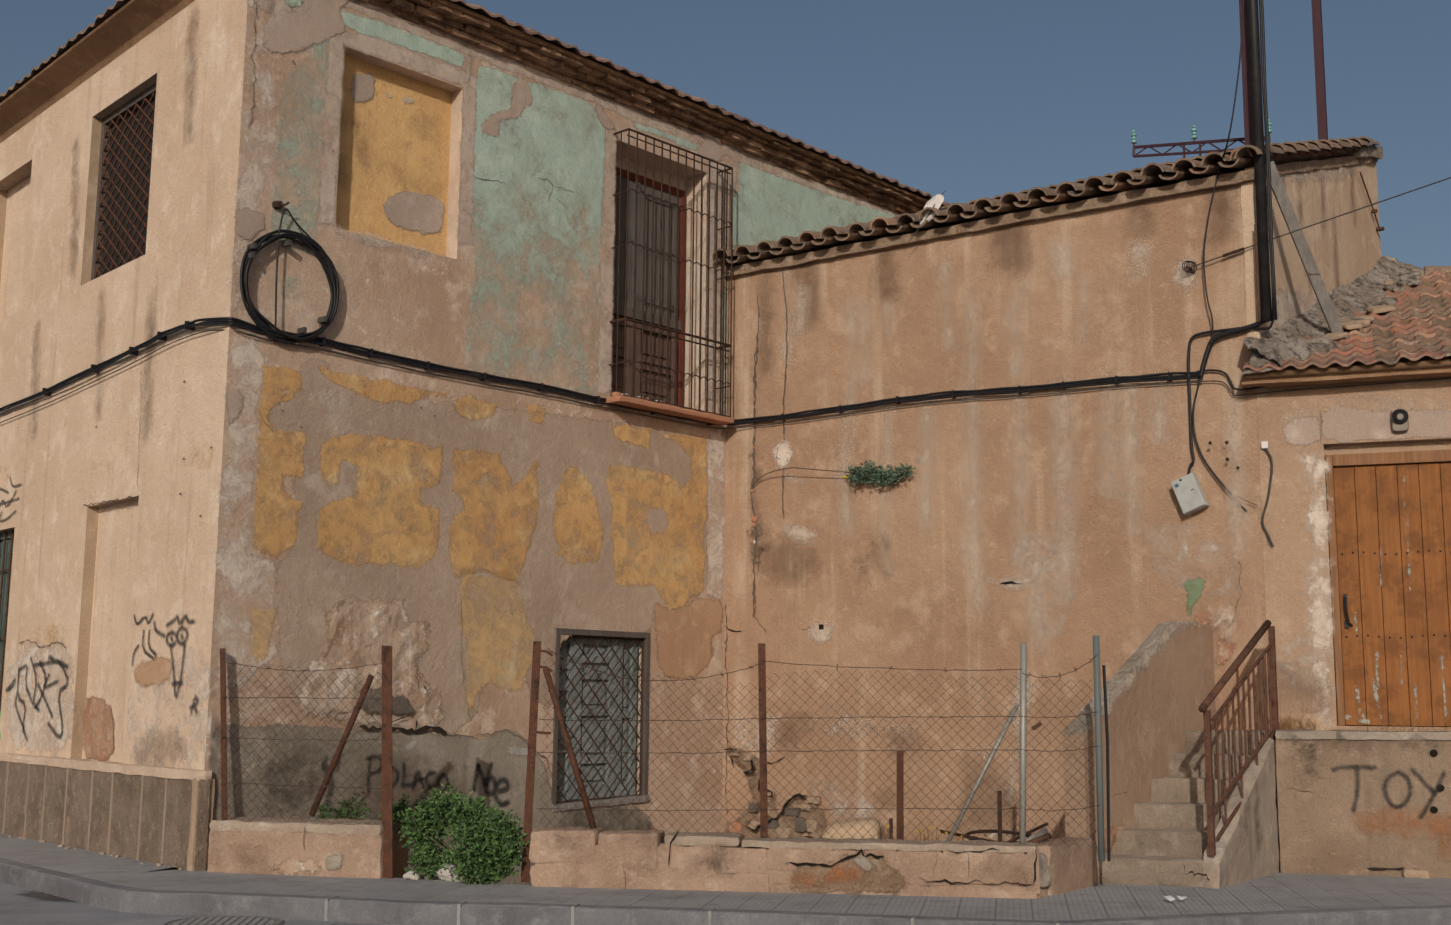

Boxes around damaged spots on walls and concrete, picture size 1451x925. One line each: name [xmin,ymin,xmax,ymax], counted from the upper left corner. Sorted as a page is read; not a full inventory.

peeling [235,70,334,241]
peeling [340,11,606,381]
peeling [634,112,698,150]
peeling [733,162,894,258]
peeling [210,285,727,688]
peeling [297,595,444,730]
peeling [1345,652,1381,724]
spalling [723,746,828,838]
spalling [785,826,905,895]